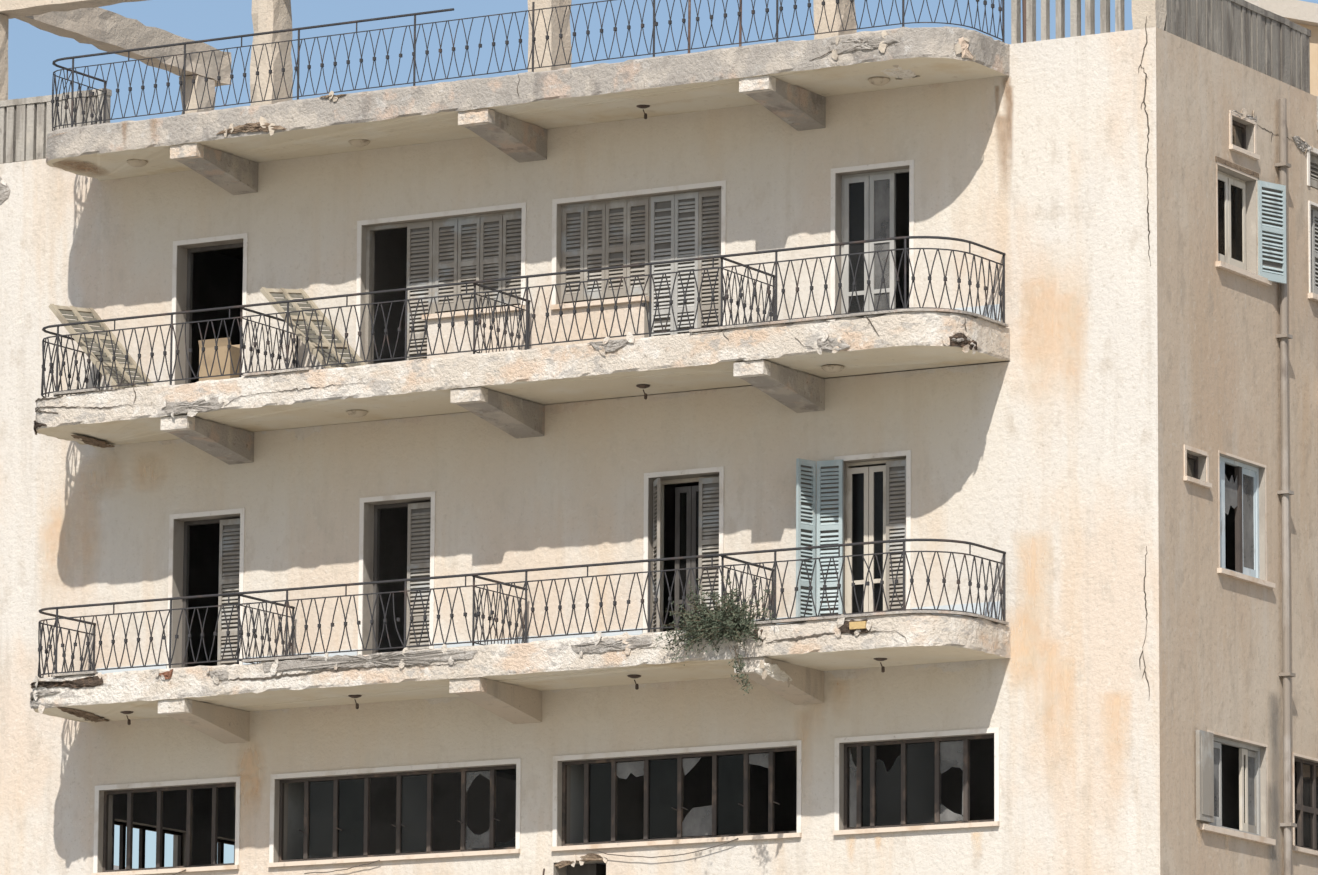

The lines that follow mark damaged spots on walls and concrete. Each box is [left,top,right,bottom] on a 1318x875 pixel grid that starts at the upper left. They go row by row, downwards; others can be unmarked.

crack [1138,16,1151,266]
flaking render [1292,136,1313,154]
flaking render [0,177,11,205]
flaking render [817,332,851,355]
spalling [942,331,979,354]
flaking render [161,394,224,418]
crack [1139,546,1150,696]
flaking render [571,632,653,657]
flaking render [262,644,478,675]
spalling [155,669,173,680]
spalling [30,672,109,722]